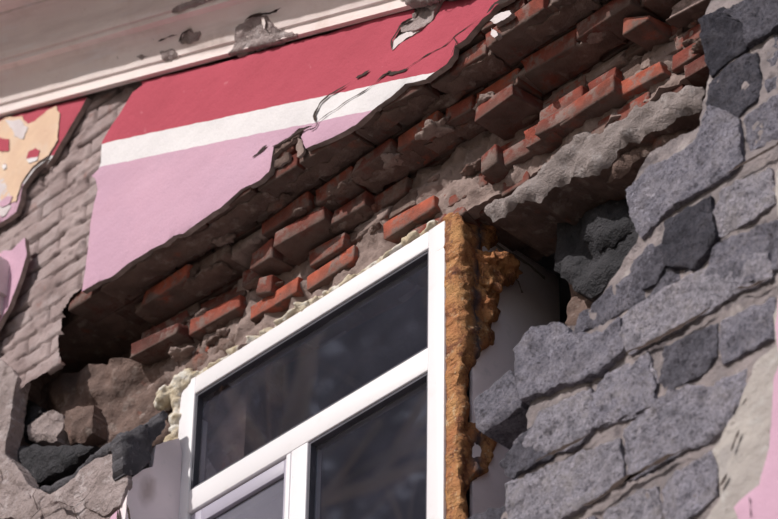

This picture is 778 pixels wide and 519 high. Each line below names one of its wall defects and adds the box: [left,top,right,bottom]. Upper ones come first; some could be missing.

flaking render [159,28,201,61]
flaking render [171,0,212,13]
flaking render [228,8,298,58]
crack [390,17,414,48]
flaking render [392,0,457,50]
crack [487,0,516,41]
crack [310,24,471,130]
flaking render [272,126,310,169]
spalling [0,79,173,519]
spalling [185,327,236,371]
flaking render [706,299,778,519]